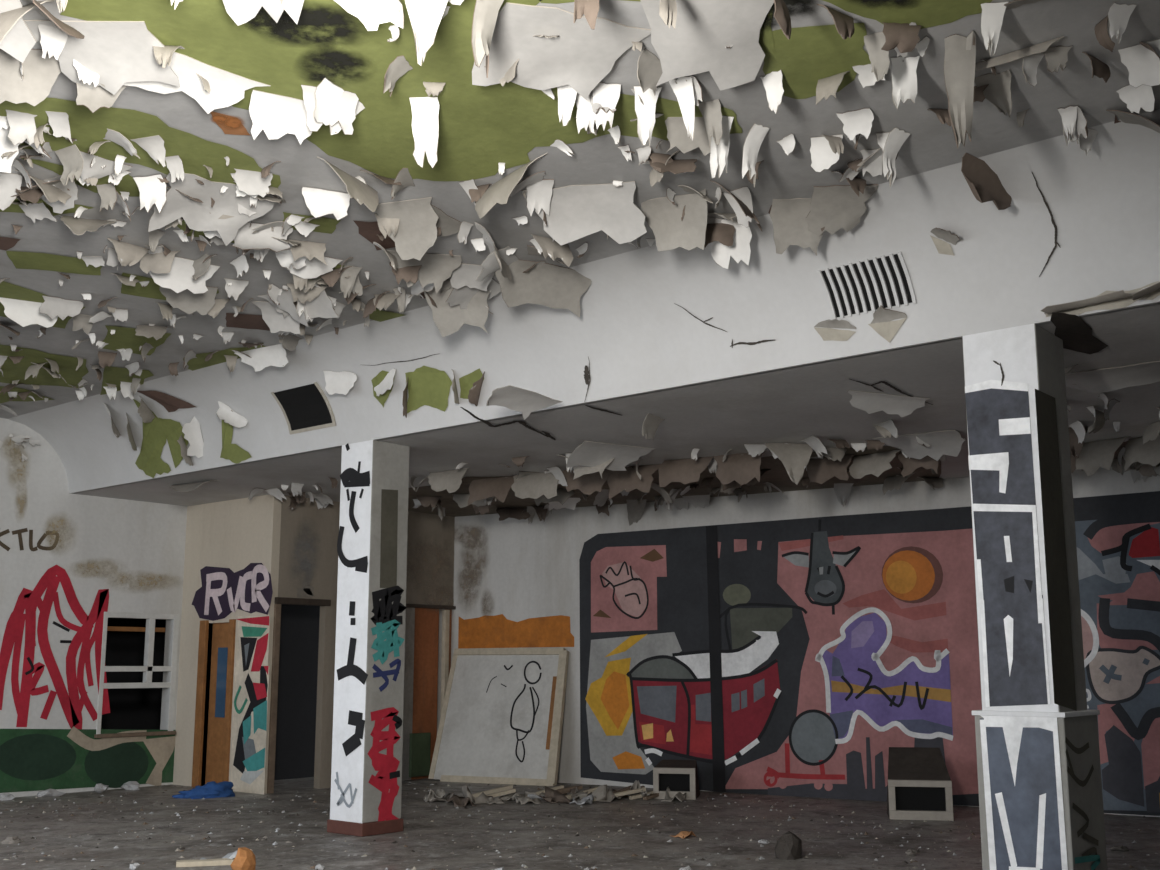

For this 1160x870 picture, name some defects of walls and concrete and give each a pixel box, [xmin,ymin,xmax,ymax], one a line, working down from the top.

peeling [0,0,1160,492]
crack [1032,173,1061,277]
peeling [248,477,338,511]
peeling [408,390,965,526]